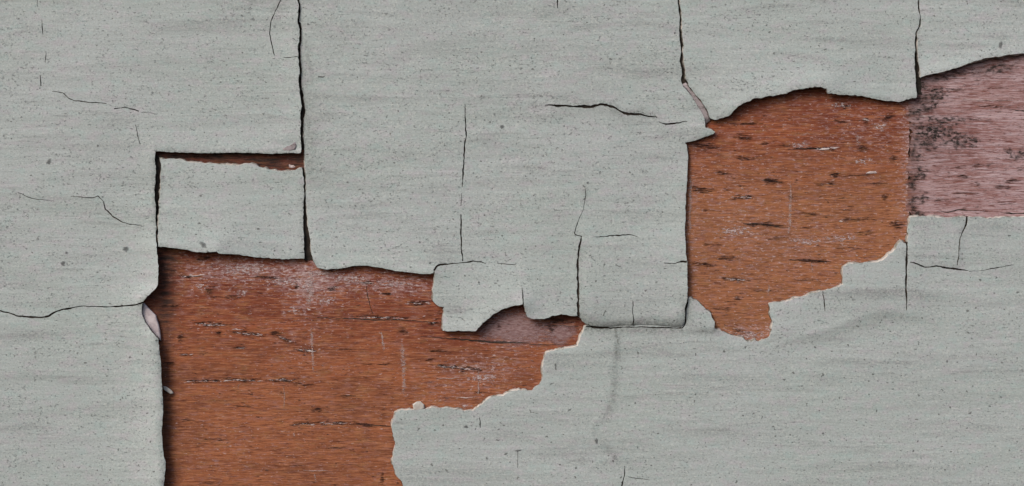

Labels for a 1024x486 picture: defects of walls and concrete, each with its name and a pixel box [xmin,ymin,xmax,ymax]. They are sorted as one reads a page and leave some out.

crack [0,302,144,318]
crack [20,57,162,248]
crack [269,0,324,261]
peeling [142,142,585,486]
crack [434,108,515,271]
crack [548,3,710,125]
crack [574,189,688,329]
peeling [685,55,1024,341]
crack [914,8,922,95]
crack [905,216,1011,311]